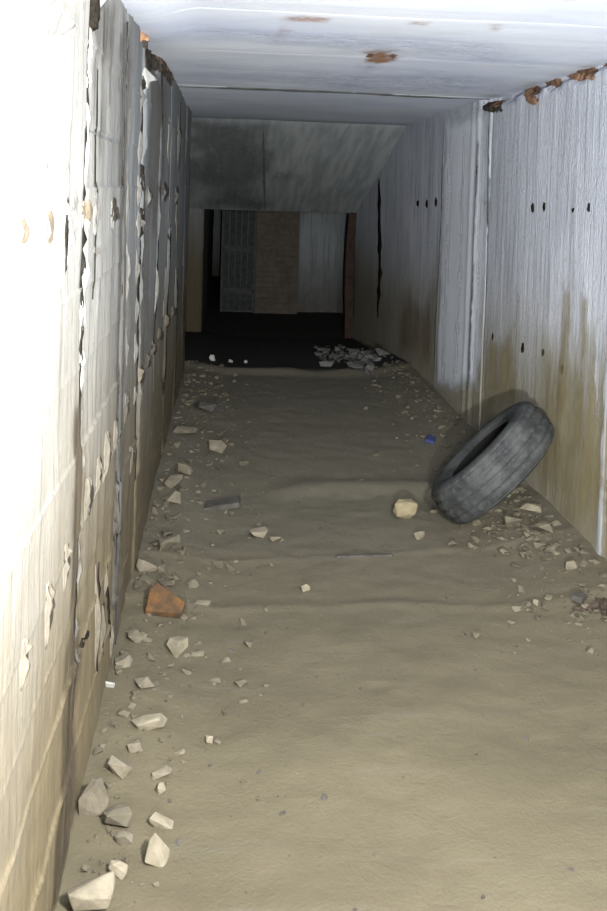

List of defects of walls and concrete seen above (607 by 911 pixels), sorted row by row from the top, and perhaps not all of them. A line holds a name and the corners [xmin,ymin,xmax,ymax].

spalling [89,0,106,32]
spalling [140,32,174,89]
rust [366,52,397,63]
spalling [45,192,120,273]
peeling [82,394,130,531]
leakage [581,321,607,555]
peeling [45,543,74,650]
peeling [20,638,34,691]